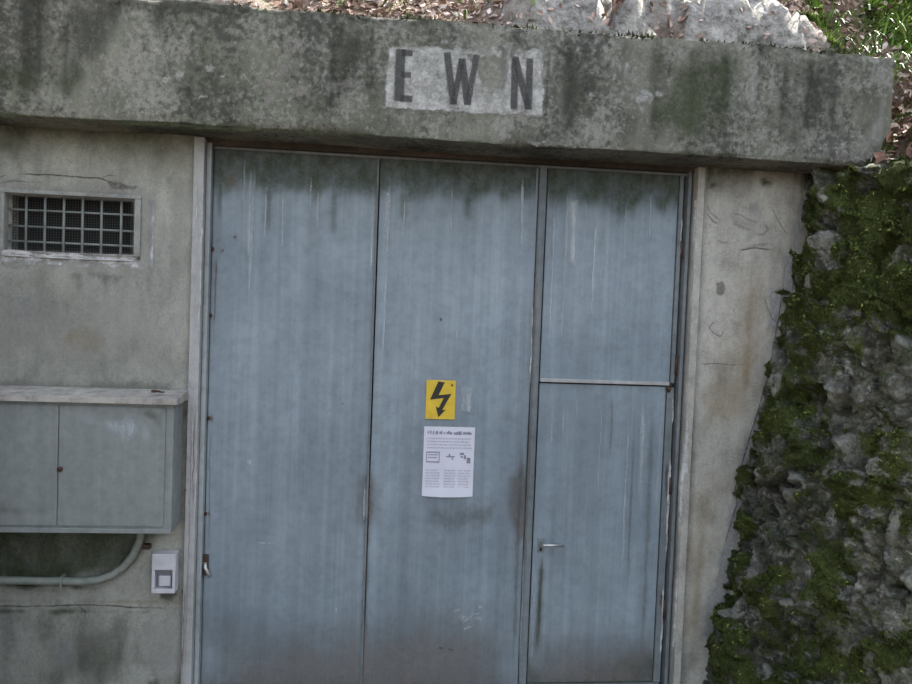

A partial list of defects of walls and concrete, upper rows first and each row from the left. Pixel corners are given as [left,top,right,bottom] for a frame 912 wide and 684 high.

crack [52,605,131,615]